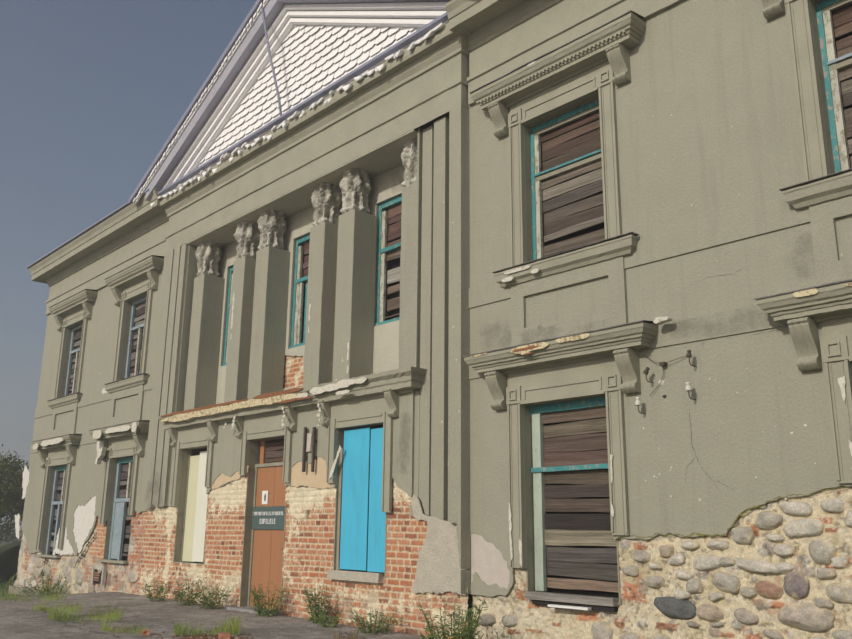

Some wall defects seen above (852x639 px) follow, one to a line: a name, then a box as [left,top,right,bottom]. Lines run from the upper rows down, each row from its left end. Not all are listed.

flaking render [793,288,819,297]
flaking render [511,333,591,355]
spalling [161,342,367,430]
peeling [838,376,846,403]
flaking render [33,437,64,450]
spalling [14,464,249,607]
spalling [281,445,852,639]